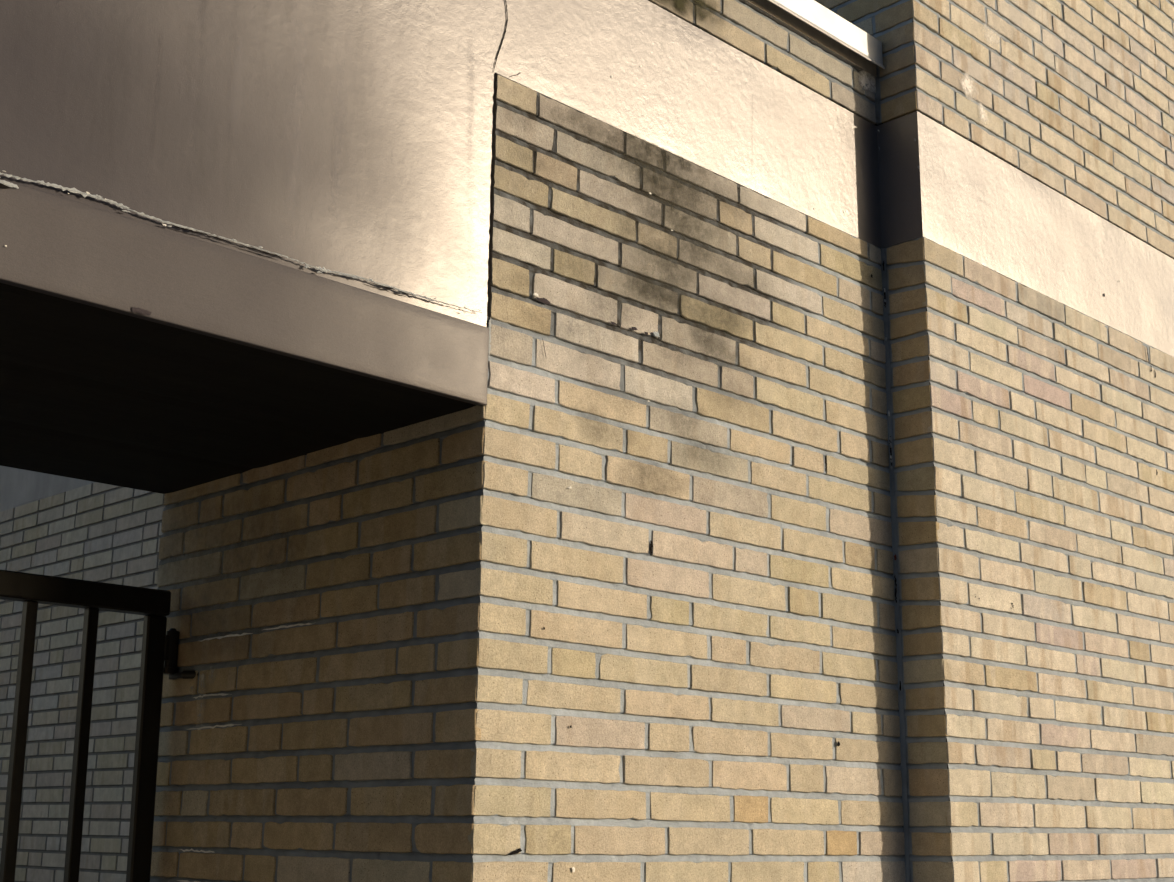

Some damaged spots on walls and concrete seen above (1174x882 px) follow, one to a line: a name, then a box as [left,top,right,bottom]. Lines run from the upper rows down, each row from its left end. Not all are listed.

leakage [663,0,712,19]
crack [488,0,521,325]
leakage [606,132,708,278]